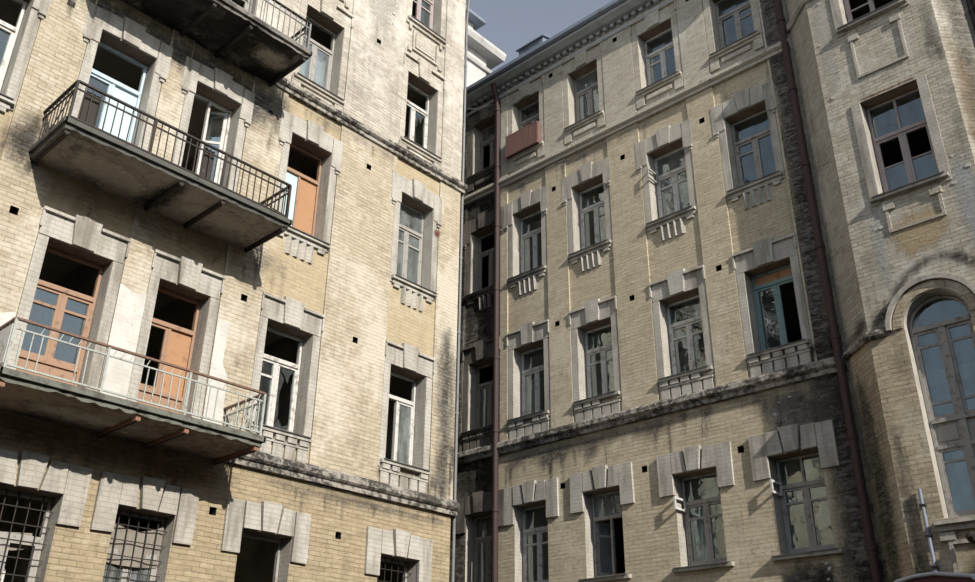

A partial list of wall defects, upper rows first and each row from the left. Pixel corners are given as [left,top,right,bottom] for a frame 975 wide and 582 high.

leakage [398,328,471,497]
leakage [754,384,832,440]